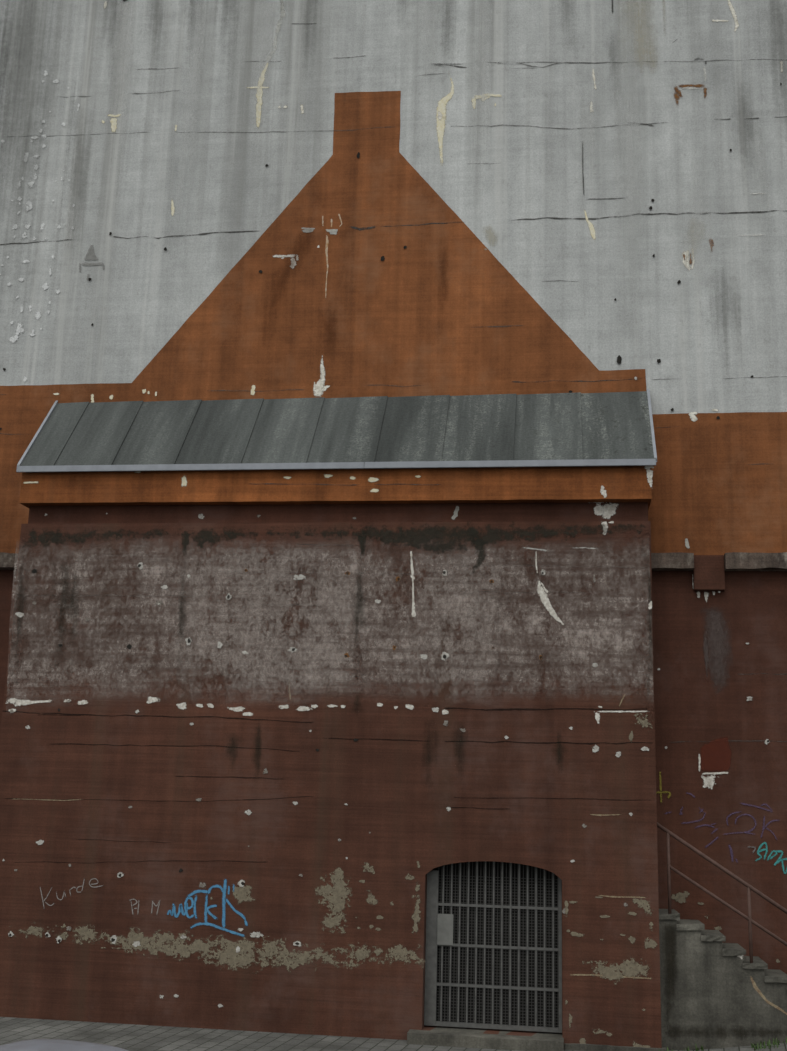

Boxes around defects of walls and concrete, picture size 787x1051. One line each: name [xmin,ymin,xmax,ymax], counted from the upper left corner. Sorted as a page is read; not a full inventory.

water stain [436,78,454,163]
rust [674,84,707,104]
crack [461,122,777,220]
crack [114,231,254,239]
spalling [588,486,619,535]
water stain [7,524,653,700]
spalling [698,754,728,789]
peeling [8,857,425,972]
peeling [582,898,657,984]